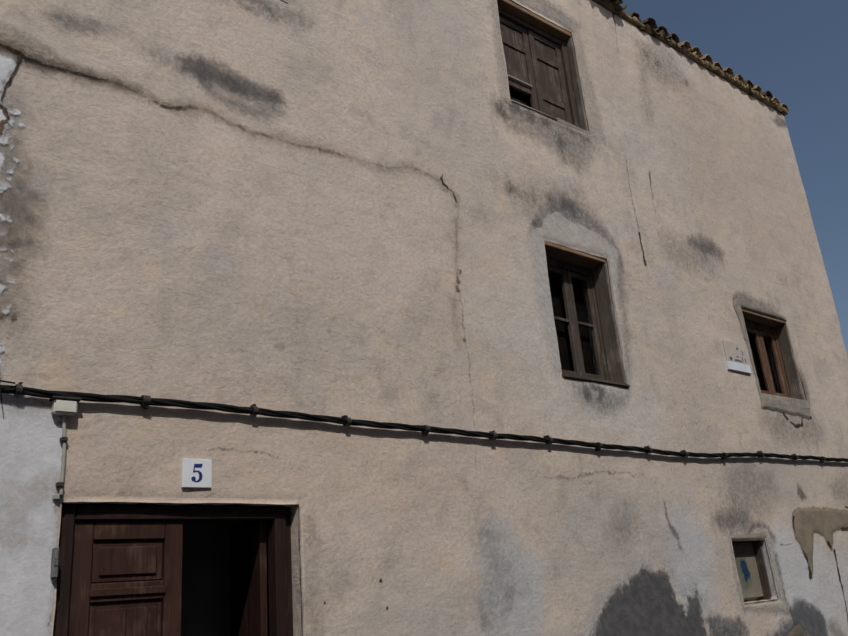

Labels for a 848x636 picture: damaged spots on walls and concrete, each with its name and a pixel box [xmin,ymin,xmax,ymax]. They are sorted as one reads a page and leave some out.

peeling [0,54,25,193]
crack [0,43,107,100]
crack [154,100,193,110]
damp [182,58,283,112]
peeling [0,393,67,636]